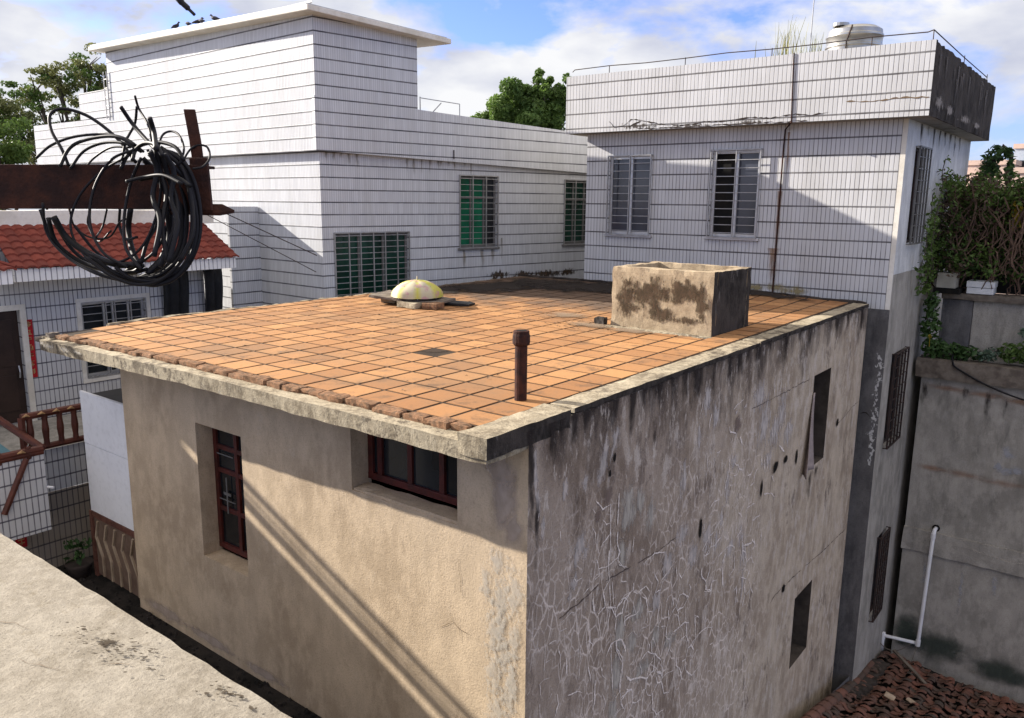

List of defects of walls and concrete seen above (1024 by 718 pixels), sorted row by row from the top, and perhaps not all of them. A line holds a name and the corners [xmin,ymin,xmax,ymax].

crack [612,96,928,129]
damp [613,340,772,430]
peeling [867,354,885,465]
crack [528,378,843,718]
damp [50,622,158,673]
damp [195,681,257,710]